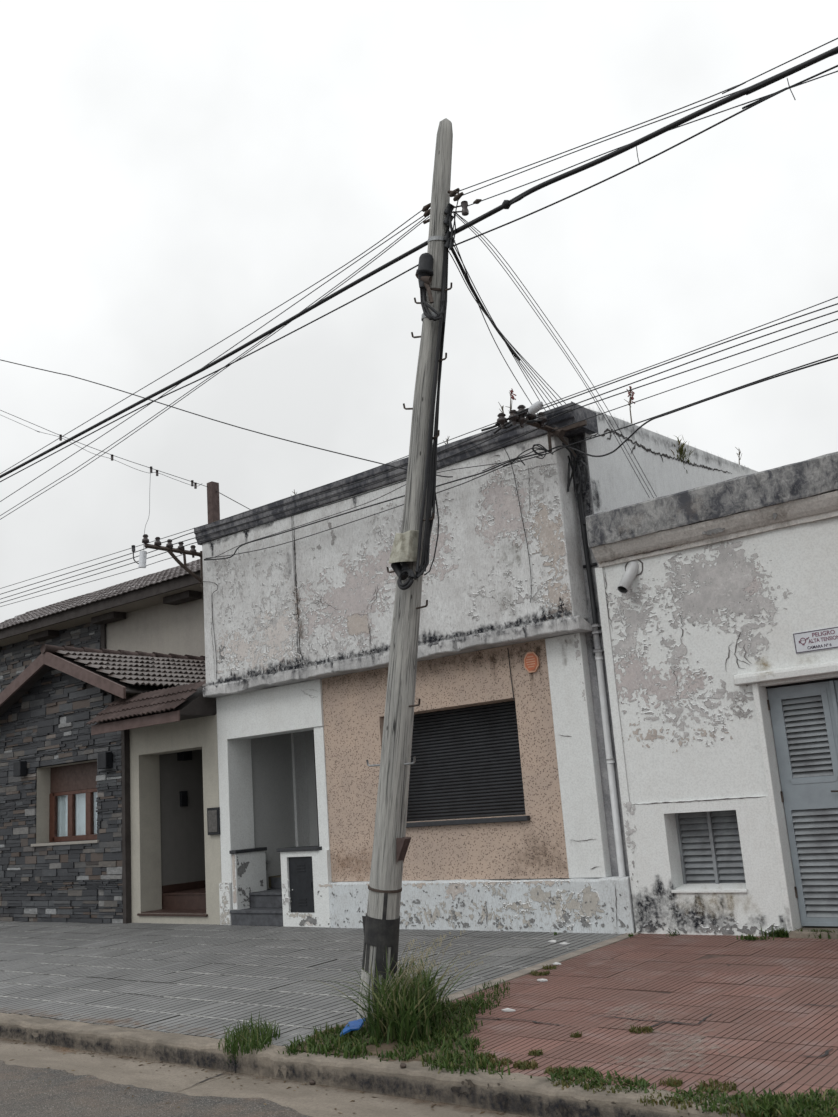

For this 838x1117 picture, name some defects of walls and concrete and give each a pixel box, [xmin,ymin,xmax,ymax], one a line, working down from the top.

peeling [422,490,460,595]
peeling [207,501,403,682]
leakage [203,645,388,693]
leakage [418,598,573,656]
peeling [607,537,791,753]
peeling [400,880,779,936]
leakage [635,876,732,932]